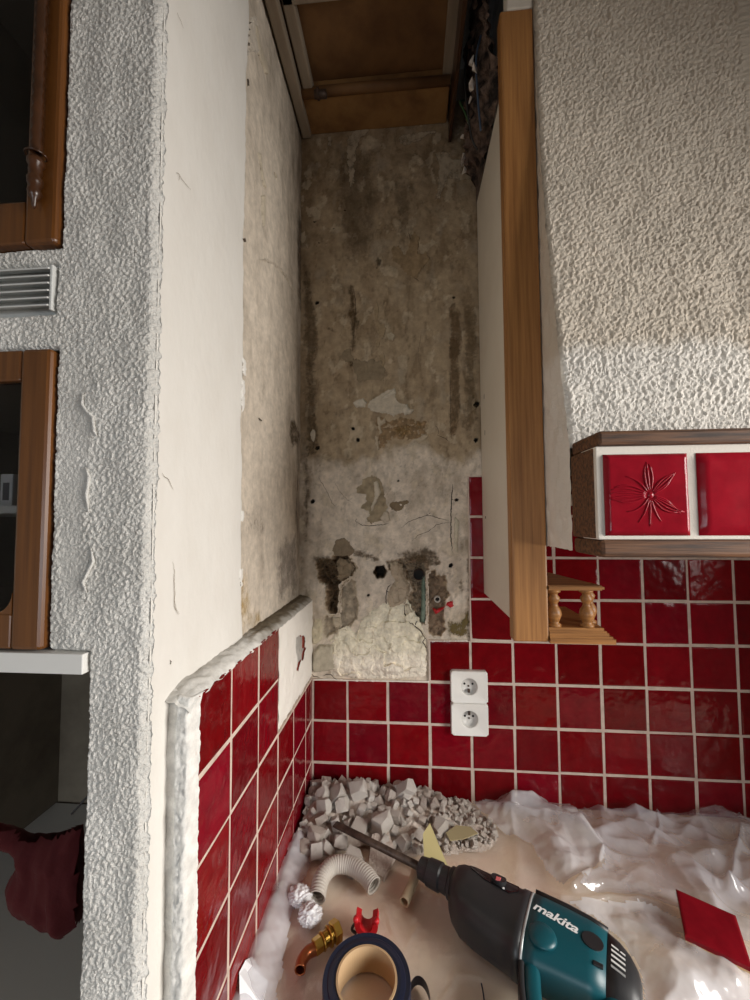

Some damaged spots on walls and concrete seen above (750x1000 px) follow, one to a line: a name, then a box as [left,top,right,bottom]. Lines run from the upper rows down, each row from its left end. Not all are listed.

water stain [290,220,317,466]
water stain [348,290,359,336]
flaking render [339,349,428,451]
water stain [449,304,461,433]
peeling [355,475,409,524]
crack [409,484,456,548]
flaking render [314,538,453,641]